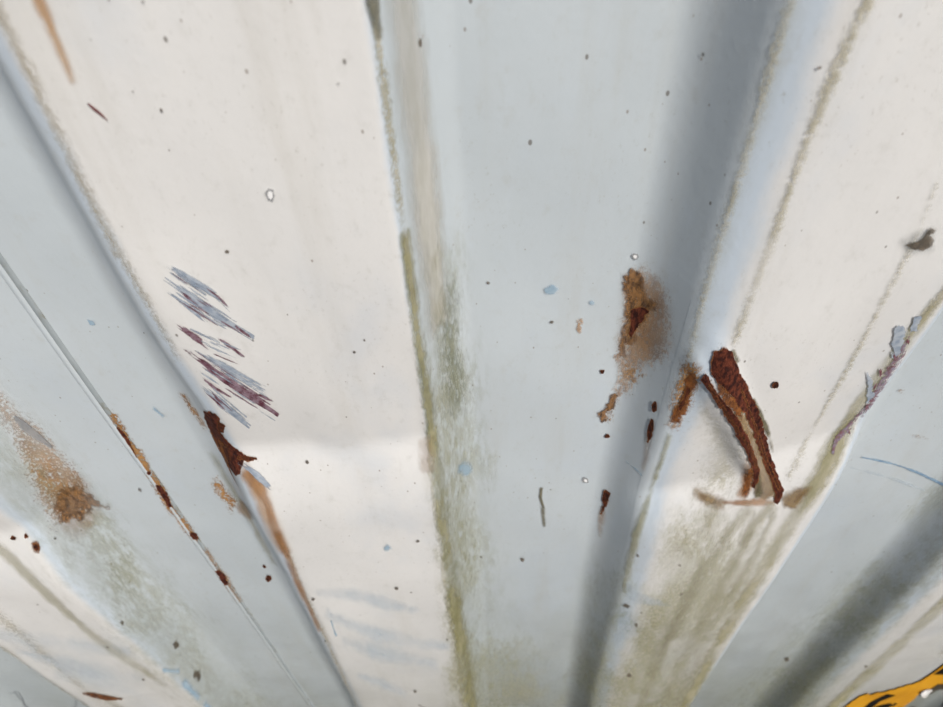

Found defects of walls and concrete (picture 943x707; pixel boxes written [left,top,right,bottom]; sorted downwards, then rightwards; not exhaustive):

rust [620,268,656,387]
damp [902,290,943,346]
rust [14,416,100,522]
rust [110,413,199,540]
rust [214,477,236,509]
rust [598,394,618,423]
rust [647,401,657,443]
rust [669,361,700,428]
damp [738,410,775,500]
damp [801,407,858,510]
rust [206,550,228,588]
damp [716,581,760,646]